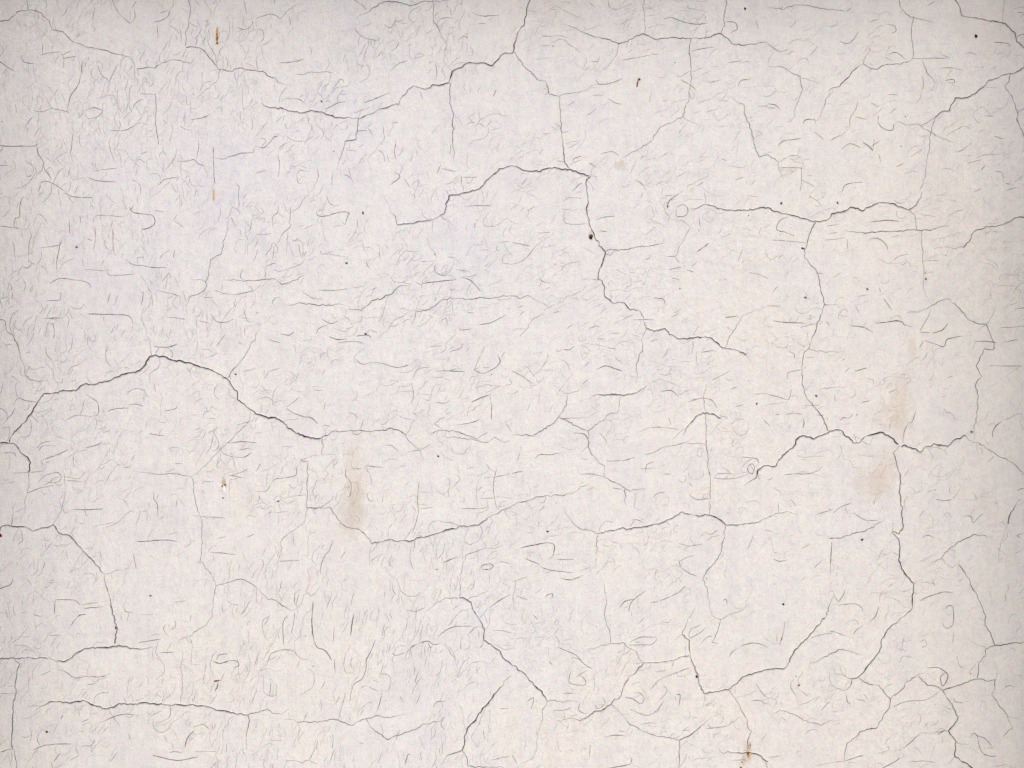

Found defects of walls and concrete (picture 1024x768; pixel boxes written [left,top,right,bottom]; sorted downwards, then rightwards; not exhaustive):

crack [954,0,1024,49]
crack [360,122,418,163]
crack [933,210,1024,266]
crack [95,488,184,544]
crack [975,488,1023,562]